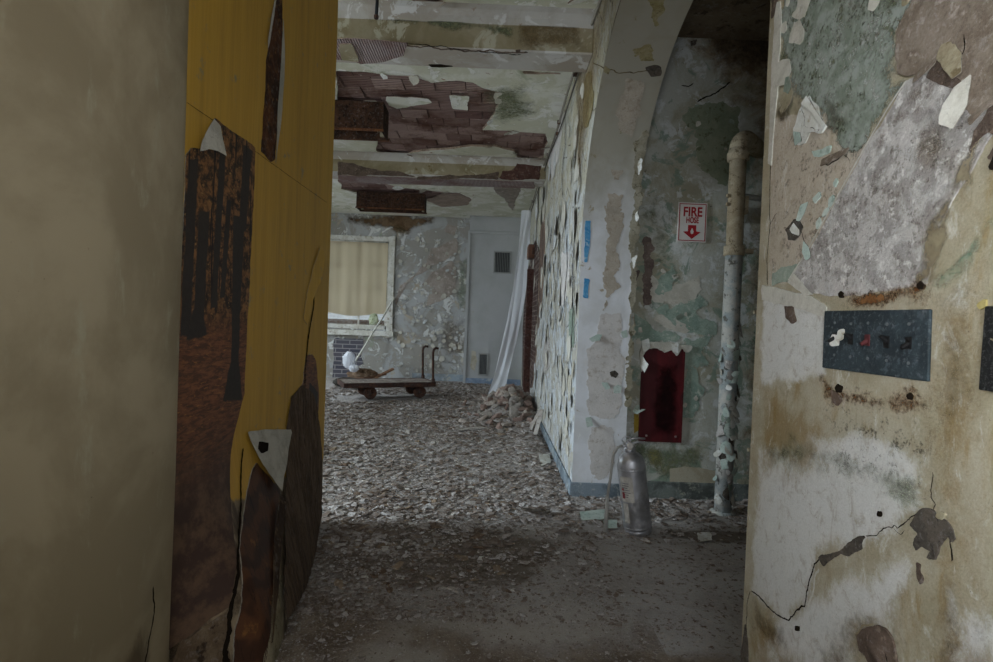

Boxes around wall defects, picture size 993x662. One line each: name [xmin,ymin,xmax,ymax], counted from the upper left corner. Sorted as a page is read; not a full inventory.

peeling [268,0,285,158]
peeling [682,101,741,186]
flaking render [778,0,993,296]
flaking render [332,338,364,378]
flaking render [338,70,594,466]
peeling [586,130,743,485]
crack [752,515,915,641]
peeling [856,623,898,662]